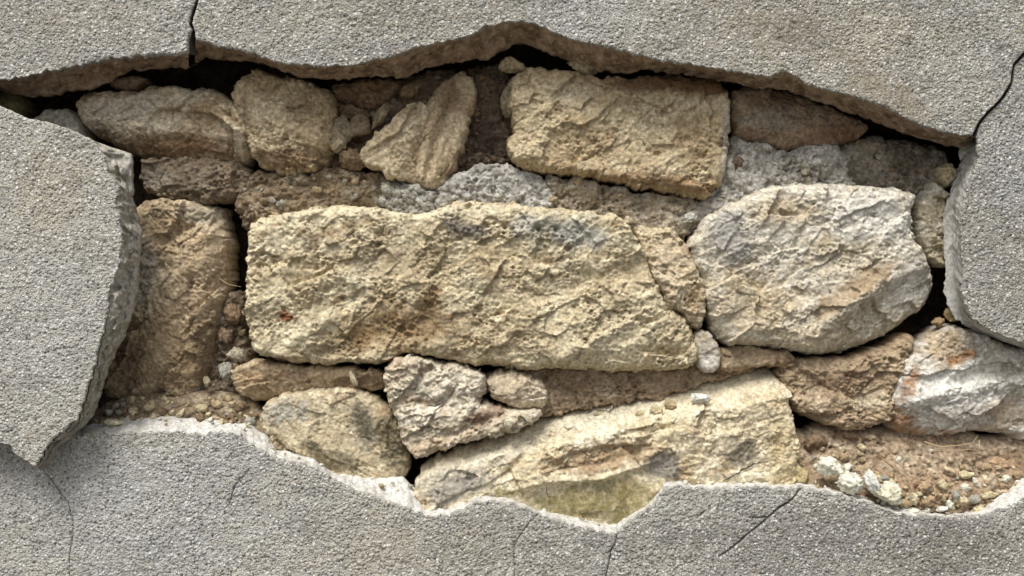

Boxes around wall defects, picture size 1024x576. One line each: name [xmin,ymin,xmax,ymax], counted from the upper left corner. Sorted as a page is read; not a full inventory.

crack [189,0,199,55]
crack [966,52,1024,140]
flaking render [0,22,1024,349]
flaking render [38,141,1024,533]
crack [719,489,800,556]